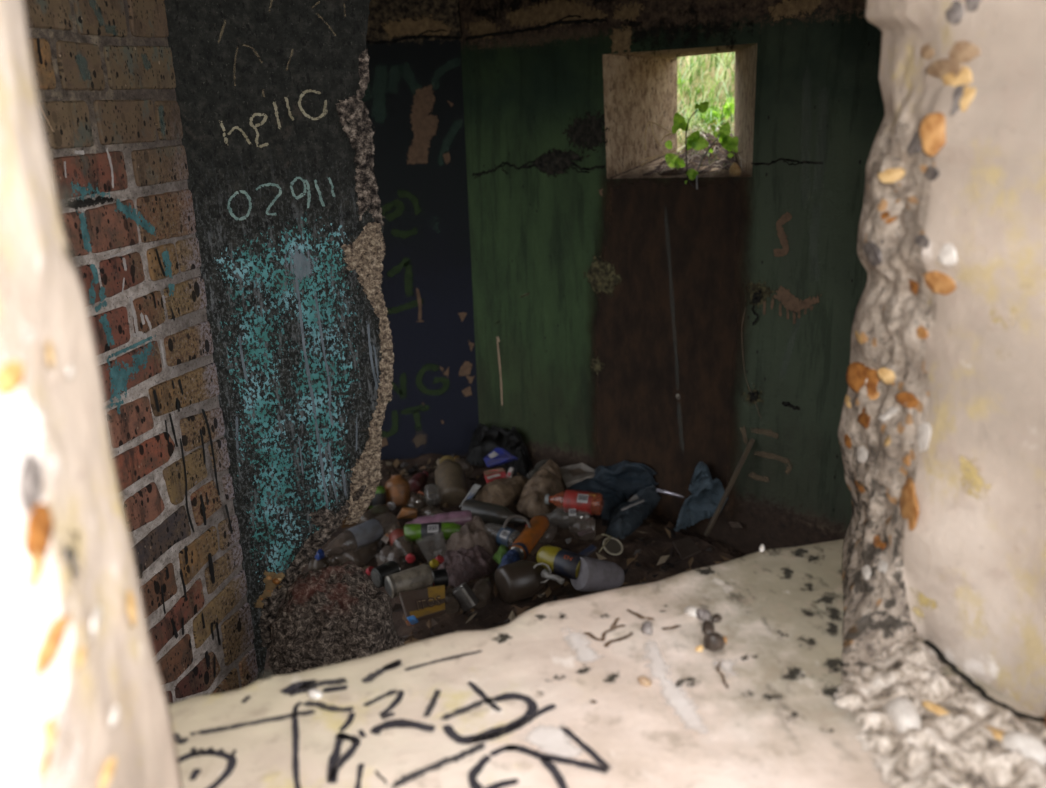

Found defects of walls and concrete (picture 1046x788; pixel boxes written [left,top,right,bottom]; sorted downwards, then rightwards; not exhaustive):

peeling [407,85,454,165]
crack [472,160,542,179]
crack [751,158,823,166]
peeling [210,48,394,648]
peeling [439,340,475,397]
crack [923,640,1046,723]